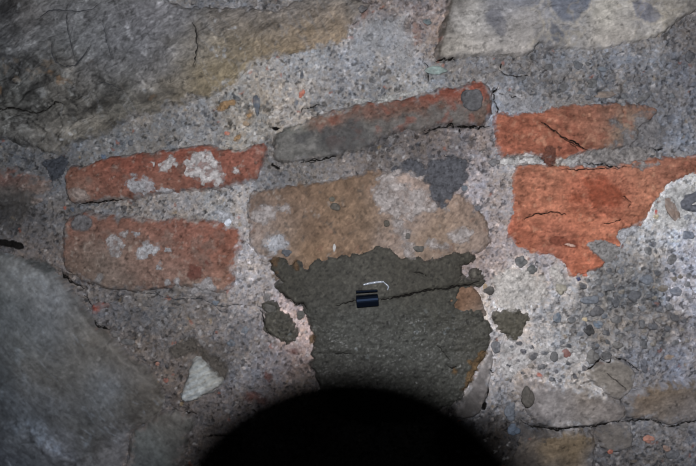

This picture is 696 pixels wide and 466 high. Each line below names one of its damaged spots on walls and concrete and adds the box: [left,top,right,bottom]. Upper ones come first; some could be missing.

crack [424,64,527,134]
crack [300,155,336,163]
crack [541,122,624,171]
crack [381,272,479,300]
crack [520,419,696,432]